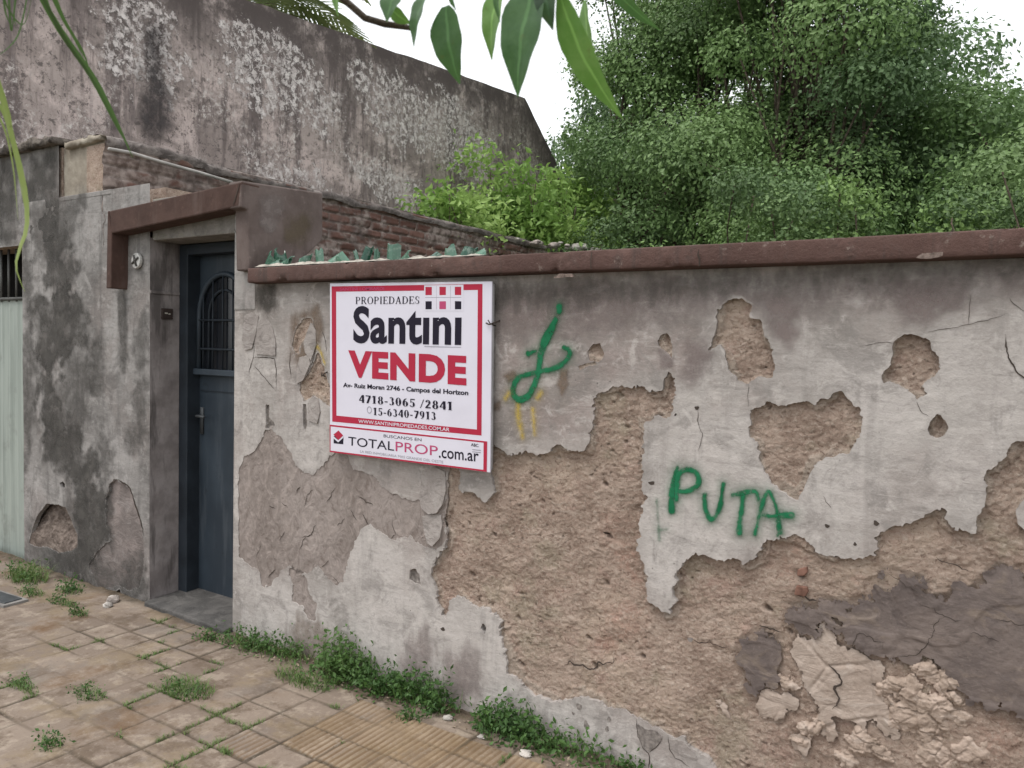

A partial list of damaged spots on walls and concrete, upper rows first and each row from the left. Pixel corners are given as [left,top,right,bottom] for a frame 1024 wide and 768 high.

water stain [140,29,172,137]
water stain [0,152,144,598]
spalling [292,318,330,424]
spalling [709,299,775,384]
spalling [882,334,940,399]
crack [931,297,1024,378]
spalling [30,504,78,553]
spalling [238,372,1024,768]